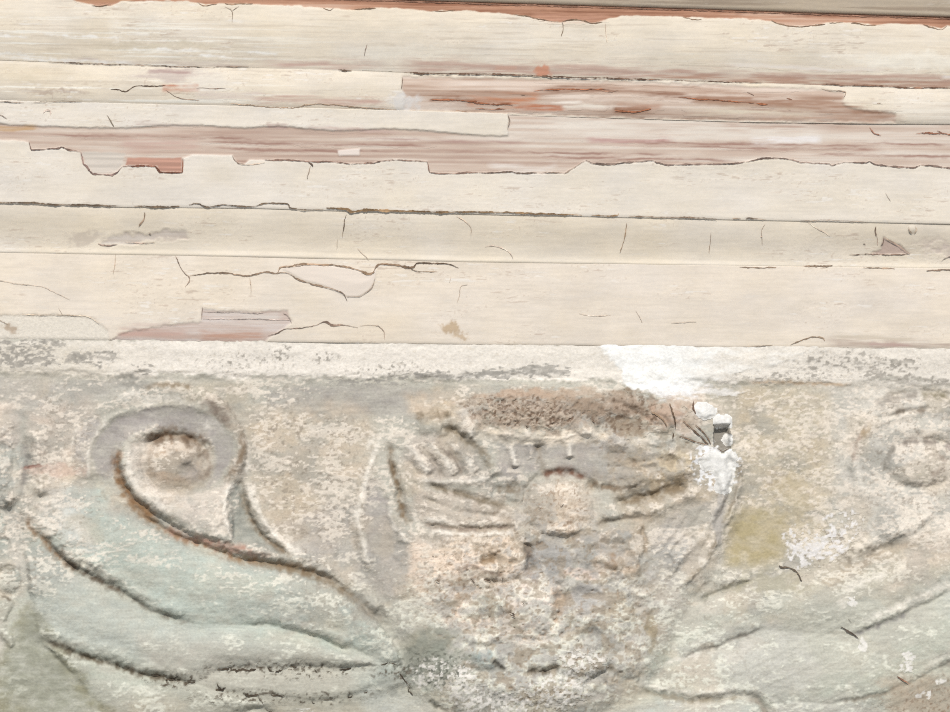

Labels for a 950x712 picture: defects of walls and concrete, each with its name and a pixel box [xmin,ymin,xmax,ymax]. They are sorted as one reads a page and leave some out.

peeling [60,0,950,30]
peeling [0,52,950,176]
peeling [856,227,950,263]
peeling [176,257,458,300]
spalling [0,303,699,442]
damp [638,381,751,402]
spalling [394,474,600,633]